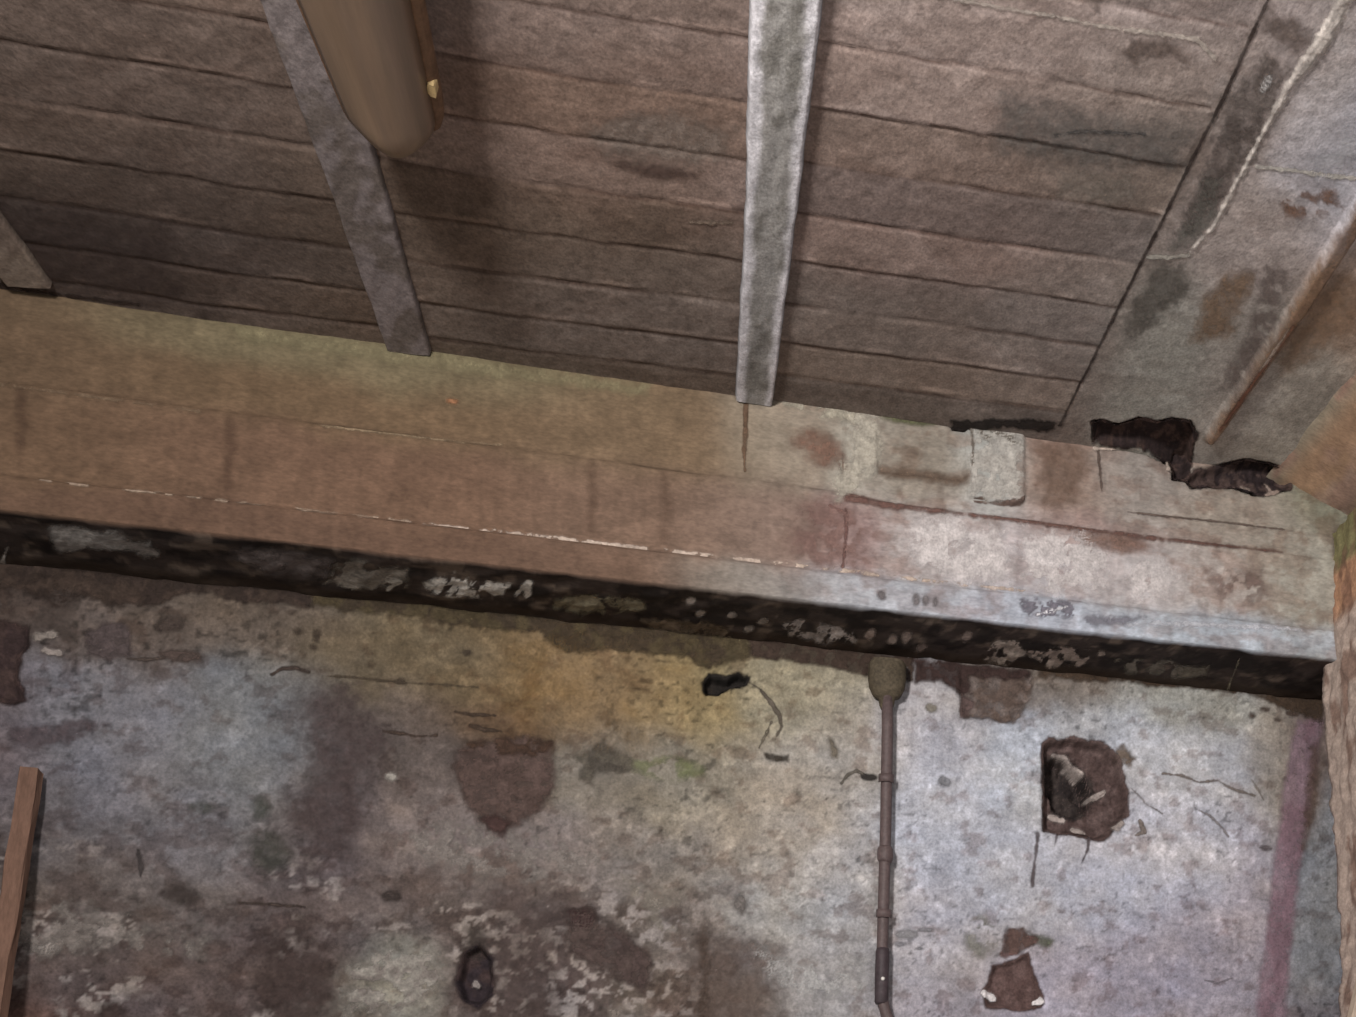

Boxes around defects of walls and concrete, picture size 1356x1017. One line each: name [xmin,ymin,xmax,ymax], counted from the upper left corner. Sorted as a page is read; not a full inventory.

leakage [1127,0,1356,333]
crack [1054,0,1269,426]
spalling [1090,416,1293,497]
peeling [51,524,159,556]
peeling [231,549,408,591]
peeling [425,577,533,598]
peeling [553,595,767,639]
spalling [0,620,62,705]
peeling [784,620,1208,723]
spalling [1031,735,1135,887]
spalling [454,927,495,1008]
spalling [967,923,1053,1011]